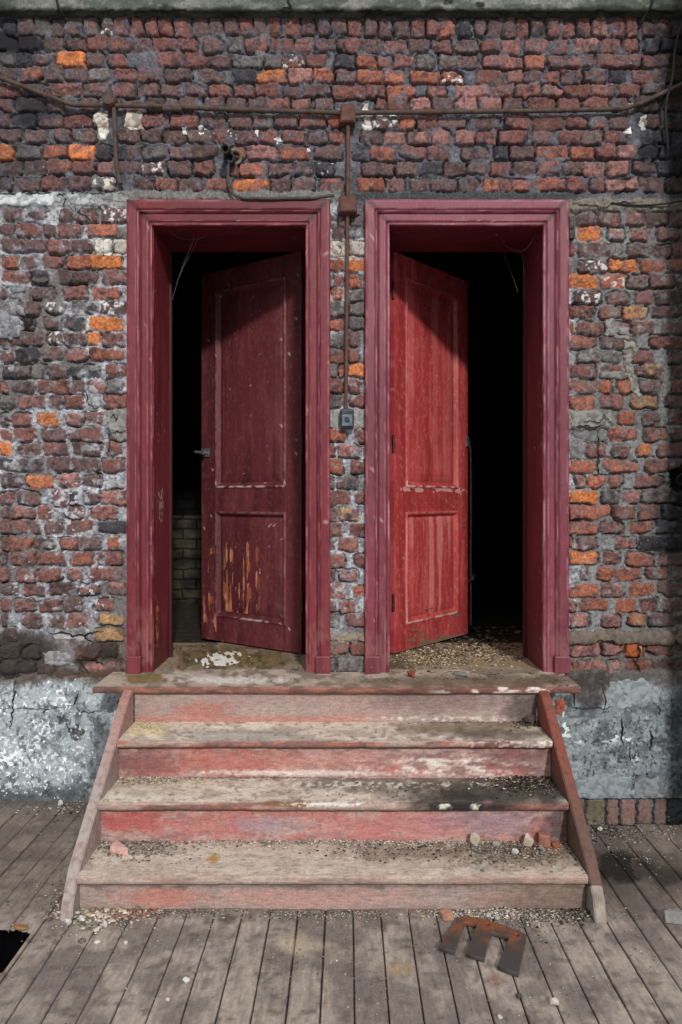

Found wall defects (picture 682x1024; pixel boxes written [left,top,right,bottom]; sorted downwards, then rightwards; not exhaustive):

peeling [203,541,260,632]
crack [0,631,103,733]
crack [573,692,661,760]